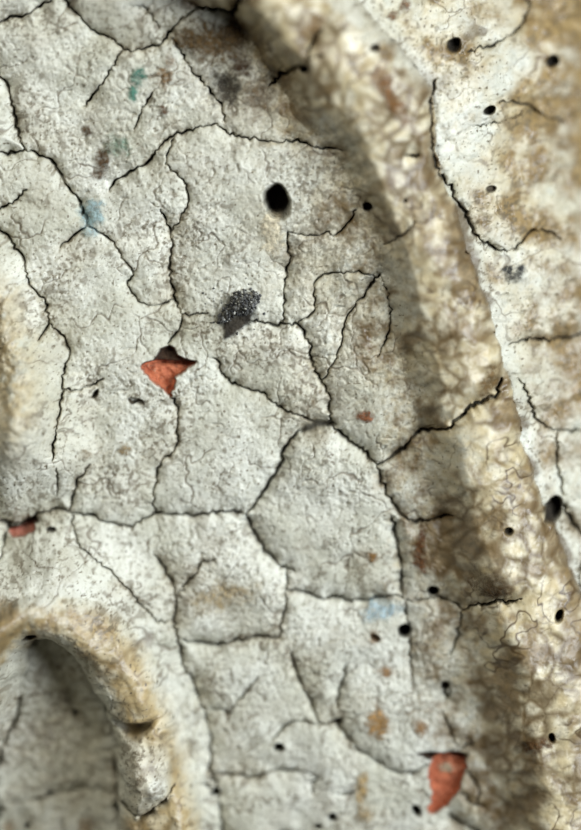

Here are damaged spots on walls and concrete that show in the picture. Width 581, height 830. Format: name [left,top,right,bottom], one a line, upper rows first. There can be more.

crack [468,0,531,52]
crack [0,0,334,343]
crack [405,80,563,251]
crack [510,332,581,344]
peeling [141,346,195,396]
crack [524,389,581,533]
peeling [8,515,39,537]
crack [0,230,516,830]
peeling [412,751,467,815]